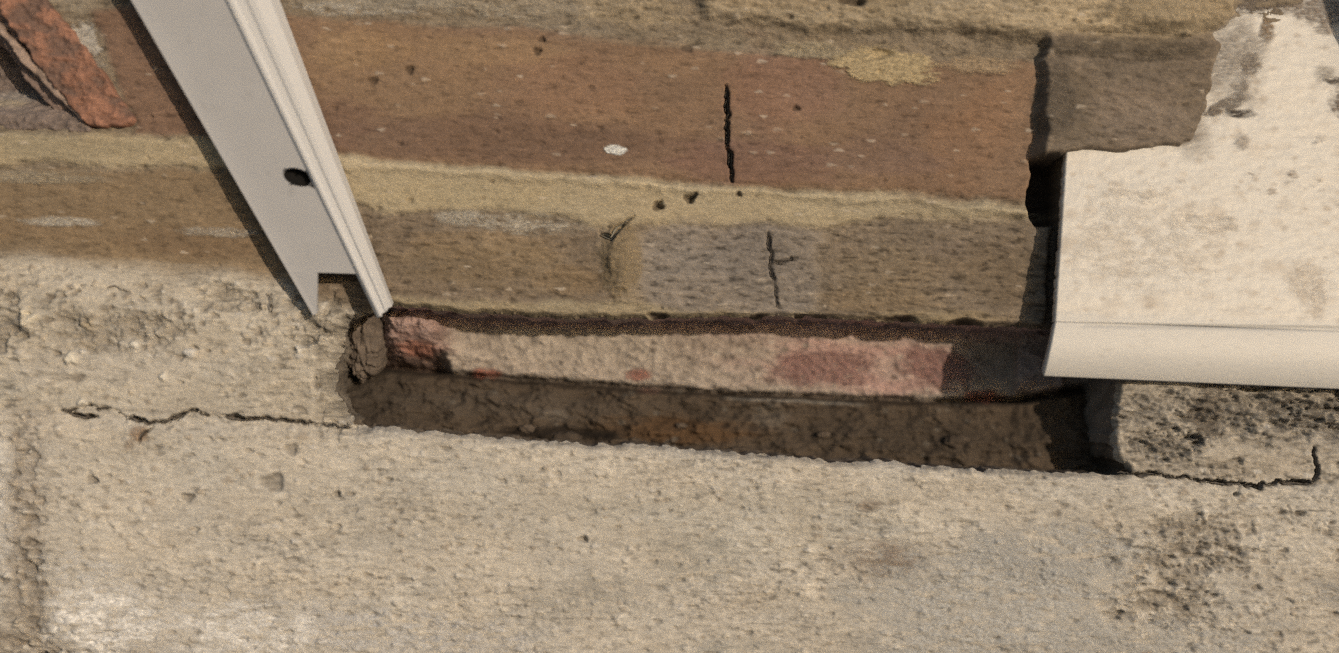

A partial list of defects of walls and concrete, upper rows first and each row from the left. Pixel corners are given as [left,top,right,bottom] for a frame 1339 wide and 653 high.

crack [725,87,733,182]
crack [601,217,633,240]
crack [767,236,796,305]
crack [62,404,353,441]
spalling [299,306,1124,475]
spalling [1130,387,1339,454]
crack [1117,447,1320,489]